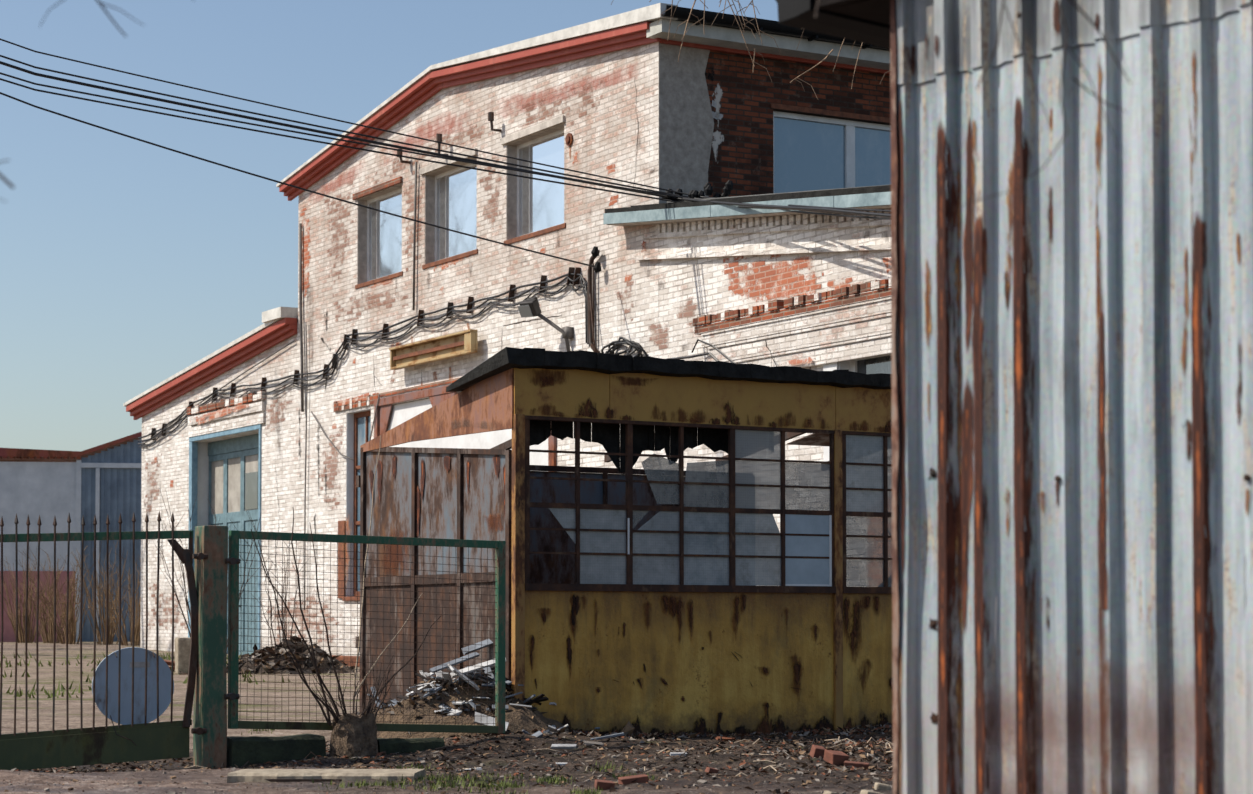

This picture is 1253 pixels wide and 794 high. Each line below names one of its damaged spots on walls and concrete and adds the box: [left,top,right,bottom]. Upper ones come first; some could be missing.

peeling [712,84,724,159]
flaking render [723,254,852,302]
rust [369,455,396,504]
rust [488,455,505,531]
rust [653,404,825,429]
rust [936,118,989,794]
rust [1013,98,1049,794]
rust [1180,198,1216,794]
rust [566,595,597,674]
rust [645,596,693,642]
rust [792,655,801,694]
rust [843,596,879,688]